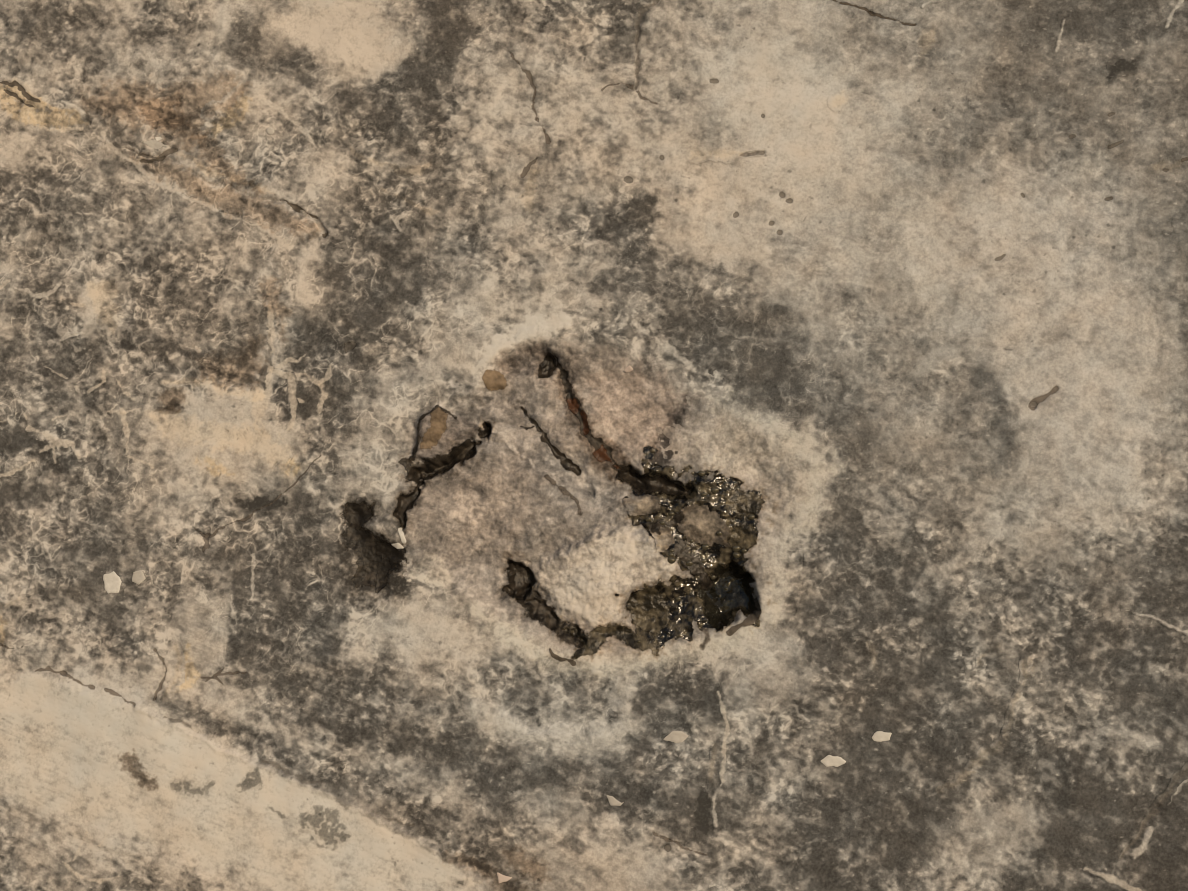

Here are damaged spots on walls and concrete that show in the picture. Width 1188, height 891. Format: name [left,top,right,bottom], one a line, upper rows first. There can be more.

spalling [383,305,864,687]